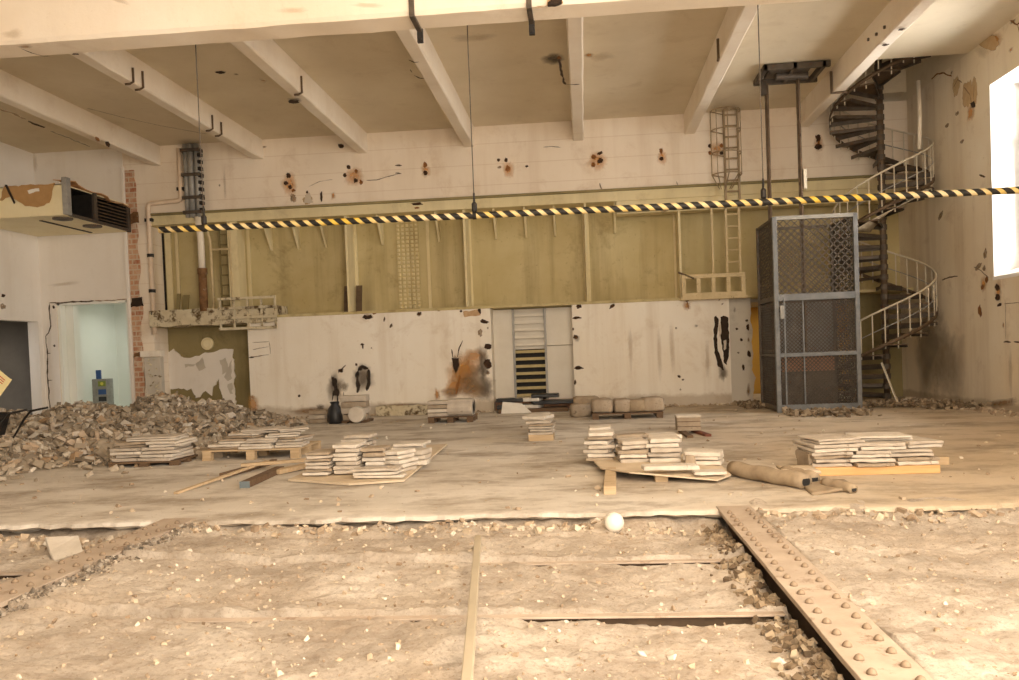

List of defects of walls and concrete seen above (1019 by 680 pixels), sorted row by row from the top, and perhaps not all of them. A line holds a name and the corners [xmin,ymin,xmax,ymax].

peeling [945,76,977,128]
rust [284,173,296,202]
peeling [168,349,237,405]
damp [297,365,370,413]
rust [435,352,489,398]